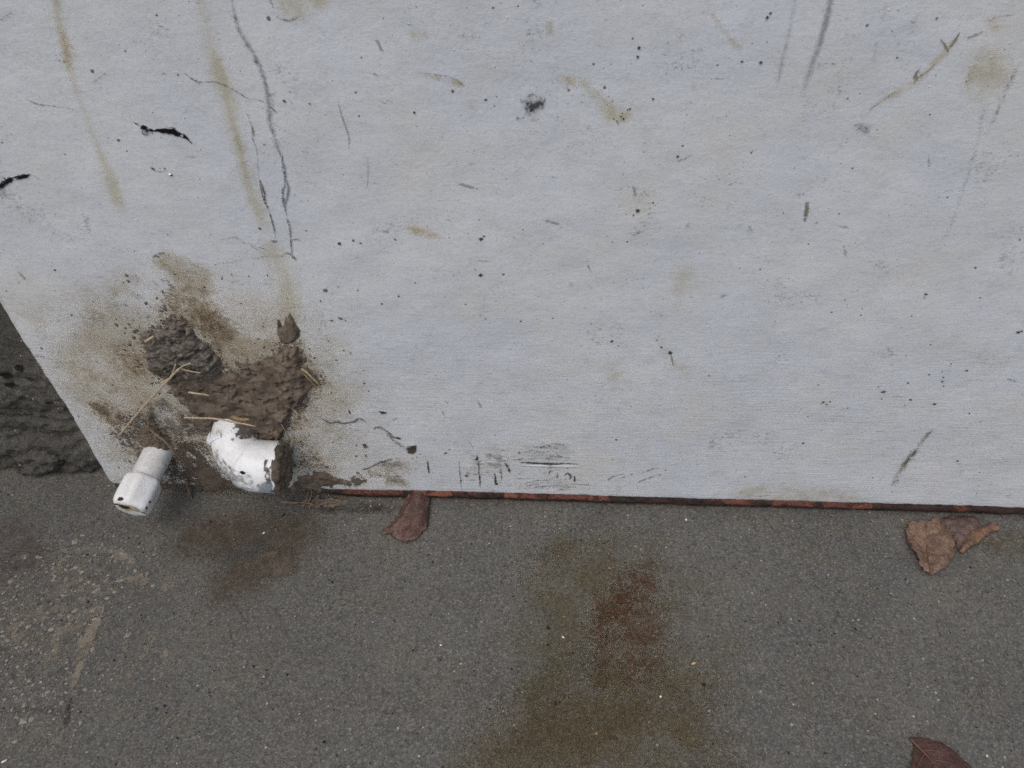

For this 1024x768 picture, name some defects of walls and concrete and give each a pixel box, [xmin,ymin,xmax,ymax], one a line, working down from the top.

corrosion [344,489,476,497]
corrosion [504,493,610,501]
corrosion [770,500,873,509]